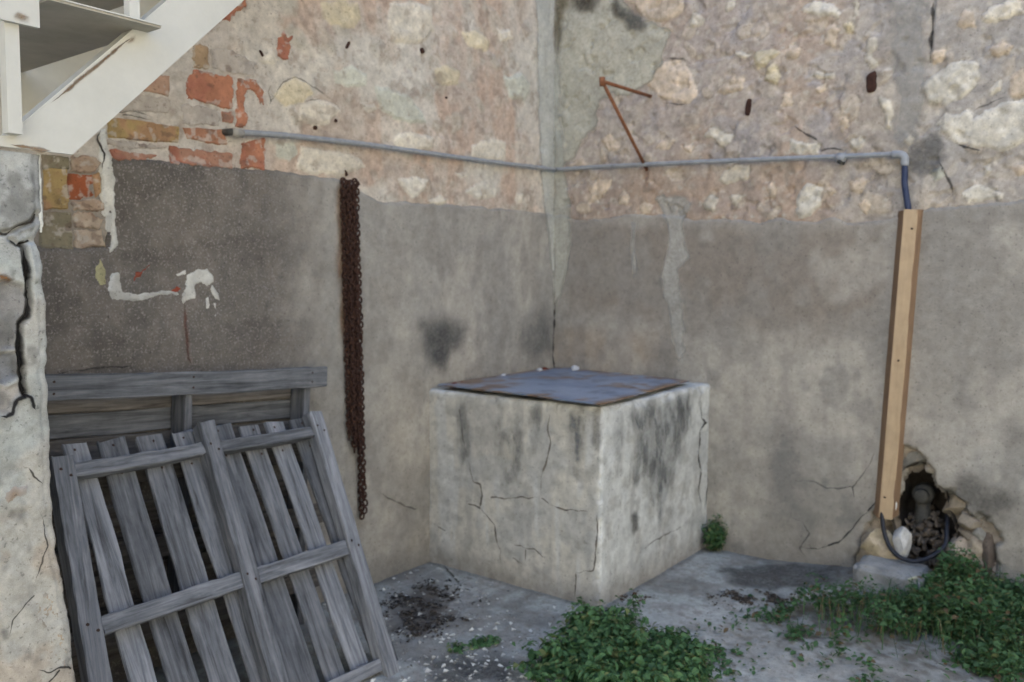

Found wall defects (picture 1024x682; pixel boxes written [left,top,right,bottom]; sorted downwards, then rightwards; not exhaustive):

spalling [222,0,247,22]
spalling [276,31,293,60]
spalling [37,44,266,317]
crack [0,212,36,418]
crack [459,409,598,596]
water stain [570,416,580,461]
water stain [636,401,689,483]
crack [698,410,708,505]
crack [794,460,875,552]
spalling [892,451,996,579]